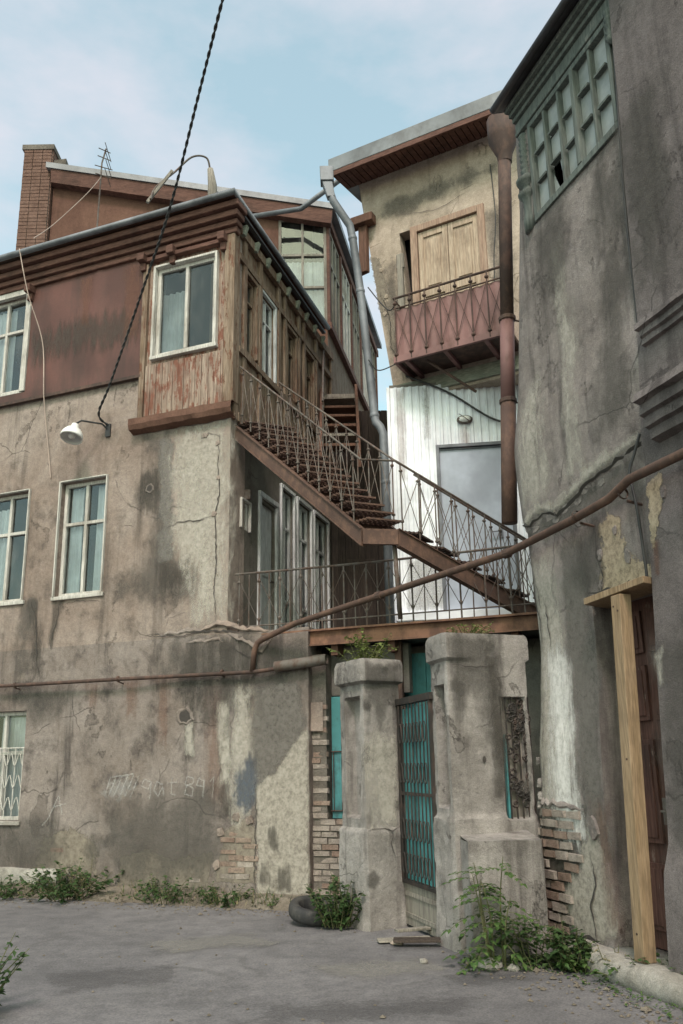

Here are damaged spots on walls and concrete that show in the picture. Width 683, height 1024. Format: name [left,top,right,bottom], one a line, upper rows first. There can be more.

water stain [120,435,210,611]
crack [149,432,260,667]
flaking render [597,514,652,590]
flaking render [646,473,667,548]
peeling [185,619,272,653]
water stain [109,638,303,874]
flaking render [117,812,259,889]
flaking render [536,757,600,944]
crack [583,856,600,944]